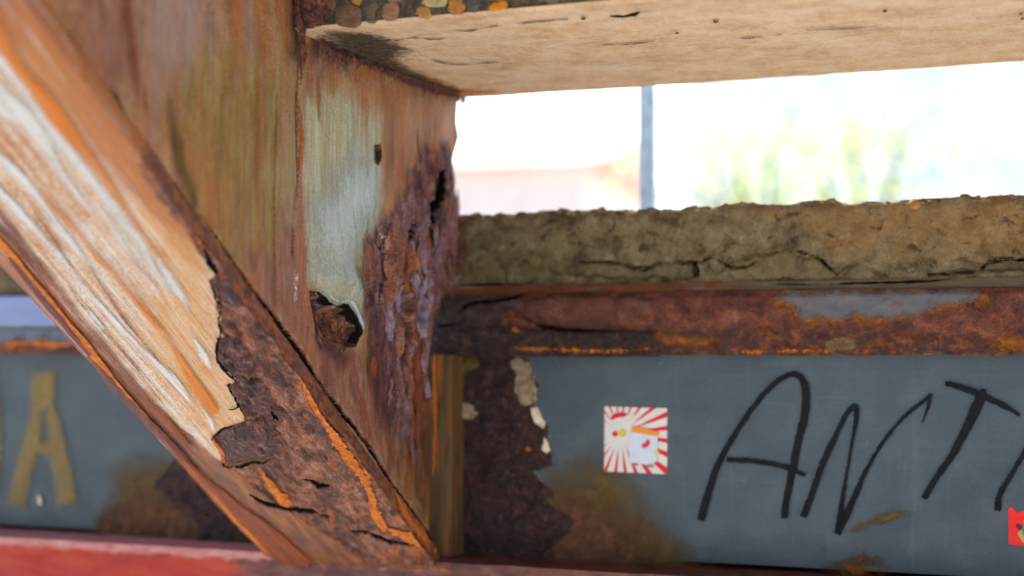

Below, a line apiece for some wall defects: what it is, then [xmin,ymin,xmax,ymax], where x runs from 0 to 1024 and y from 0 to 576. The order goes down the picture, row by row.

rust [23,162,219,416]
rust [0,212,313,567]
rust [168,102,197,208]
peeling [191,231,433,565]
crack [199,218,432,545]
rust [296,375,437,554]
rust [293,0,495,501]